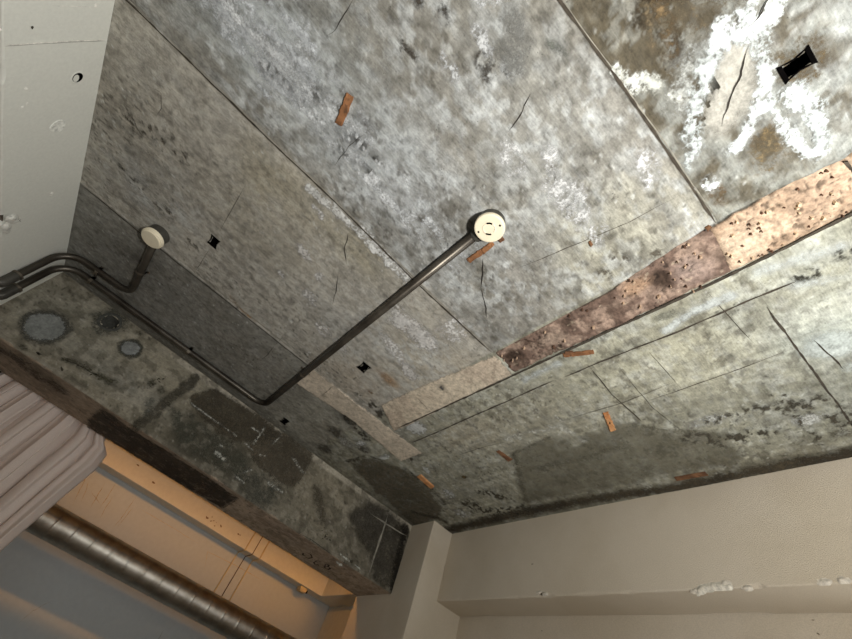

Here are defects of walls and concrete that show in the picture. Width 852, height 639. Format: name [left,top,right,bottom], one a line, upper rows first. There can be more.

damp [610,0,833,171]
crack [722,41,751,123]
efflorescence [500,140,525,177]
efflorescence [541,145,606,244]
efflorescence [636,150,659,188]
damp [702,178,726,205]
spalling [496,153,852,372]
damp [0,310,73,395]
damp [91,308,143,358]
crack [814,340,843,369]
damp [327,413,852,593]